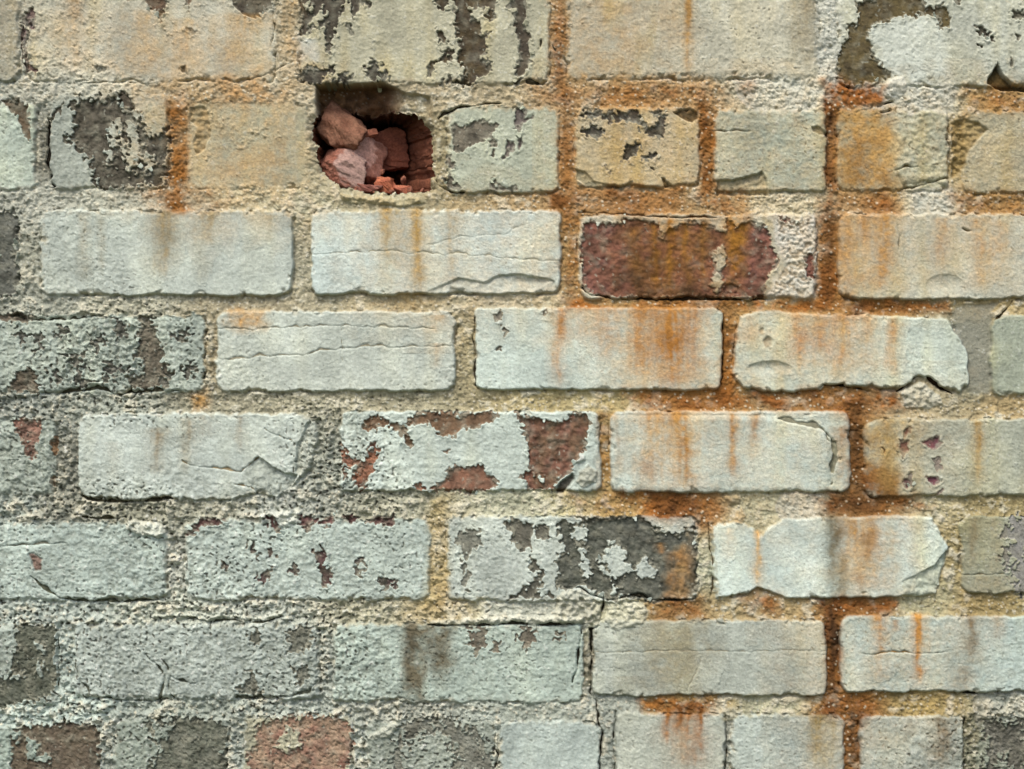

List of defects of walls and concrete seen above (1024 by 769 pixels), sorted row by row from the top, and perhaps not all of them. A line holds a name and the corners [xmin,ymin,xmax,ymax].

peeling [426,0,535,88]
peeling [835,0,961,81]
peeling [49,90,167,192]
corrosion [0,0,761,370]
spalling [351,105,534,195]
peeling [0,312,208,395]
corrosion [186,384,214,416]
peeling [339,409,500,496]
peeling [513,410,592,491]
corrosion [540,58,1024,769]
peeling [503,517,700,603]
crack [428,525,810,769]